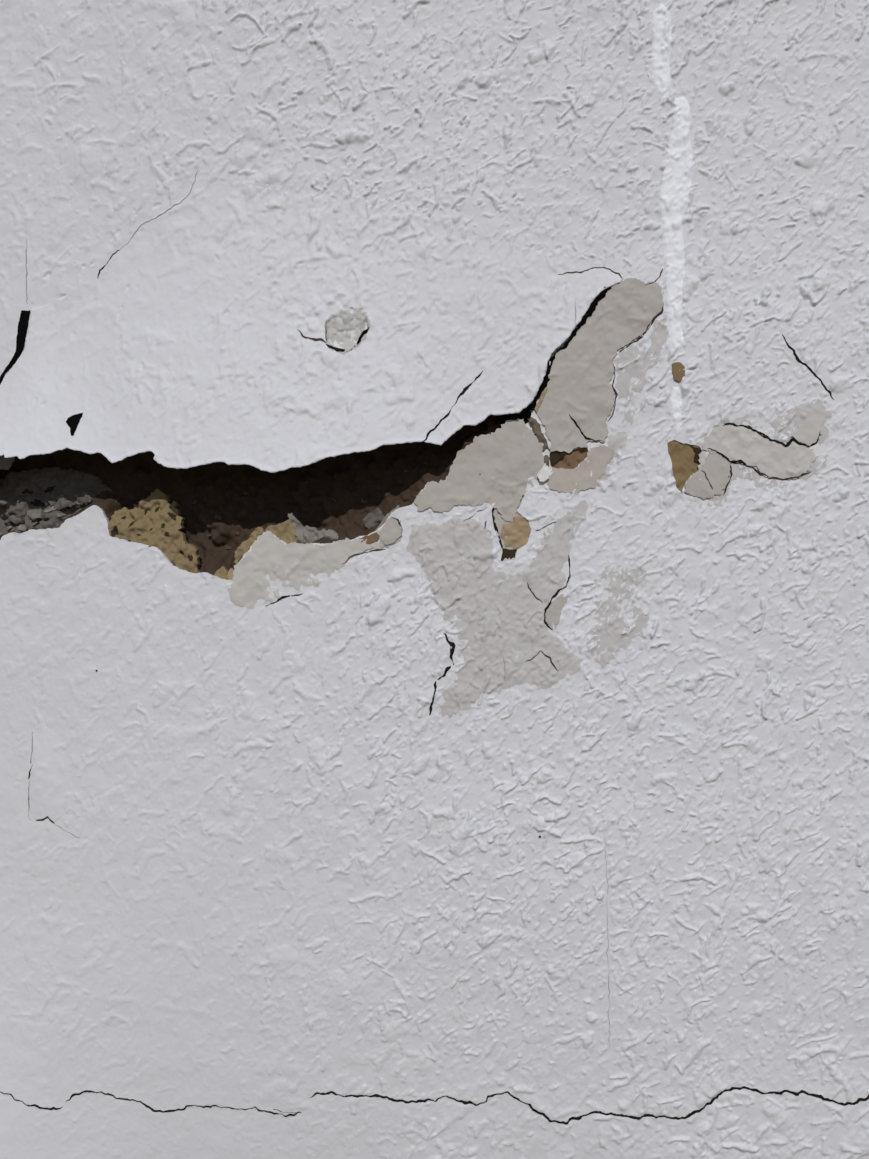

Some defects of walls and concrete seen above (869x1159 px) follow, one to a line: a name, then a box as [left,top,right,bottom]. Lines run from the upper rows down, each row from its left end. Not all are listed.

peeling [0,179,663,609]
peeling [667,419,823,499]
crack [28,732,80,838]
crack [603,851,611,1040]
crack [0,1086,869,1125]